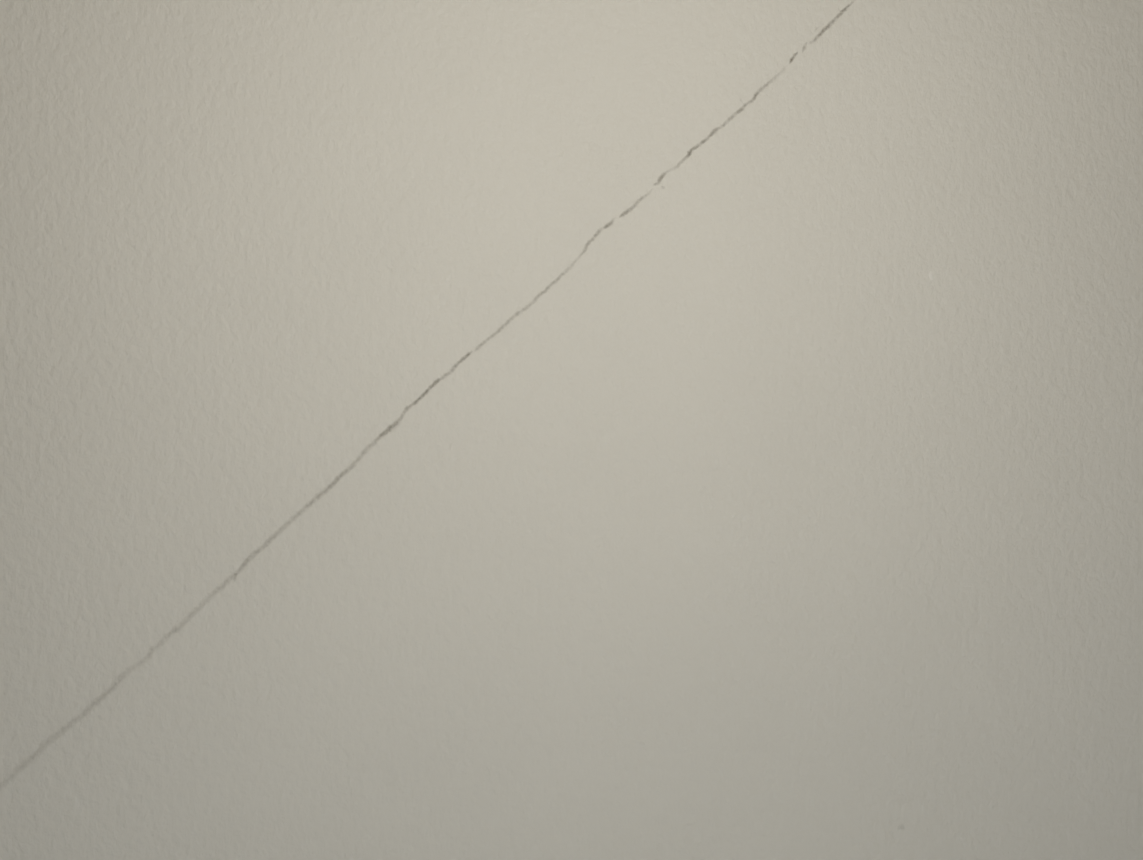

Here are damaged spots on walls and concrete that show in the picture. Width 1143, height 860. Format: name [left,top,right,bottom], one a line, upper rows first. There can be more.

crack [0,0,856,798]